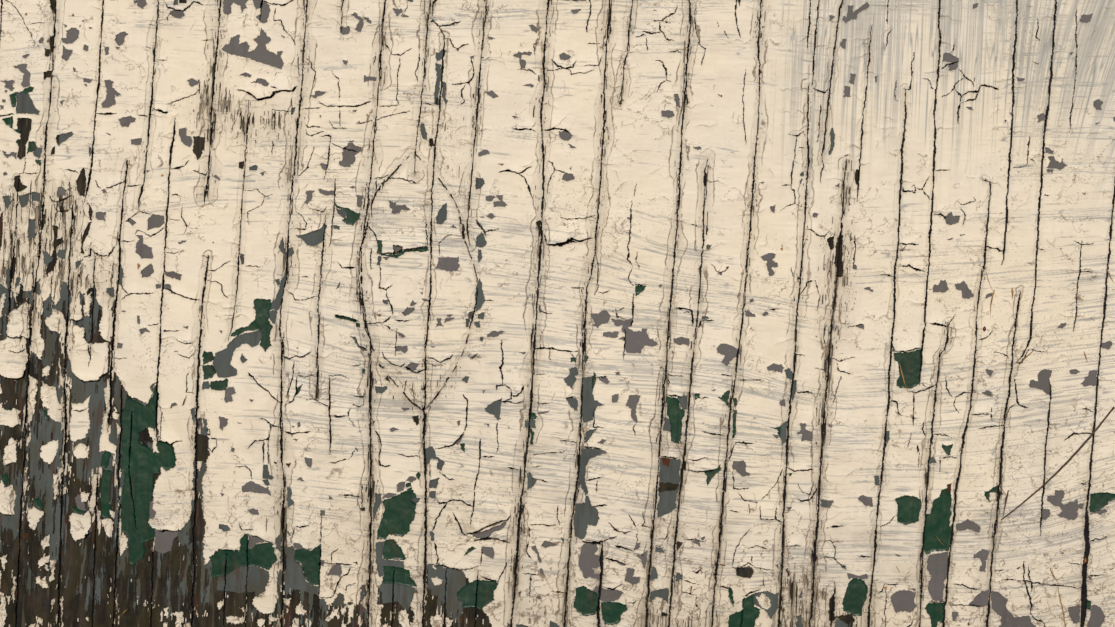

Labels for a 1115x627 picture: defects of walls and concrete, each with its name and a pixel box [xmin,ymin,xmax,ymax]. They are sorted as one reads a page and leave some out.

peeling [222,0,296,101]
peeling [0,214,200,627]
crack [0,0,499,627]
peeling [217,563,307,627]
peeling [175,186,364,403]
peeling [353,229,460,407]
peeling [590,310,659,353]
peeling [516,337,750,627]
crack [475,0,1115,627]
peeling [812,549,868,627]
peeling [892,339,934,393]
peeling [1042,490,1115,520]